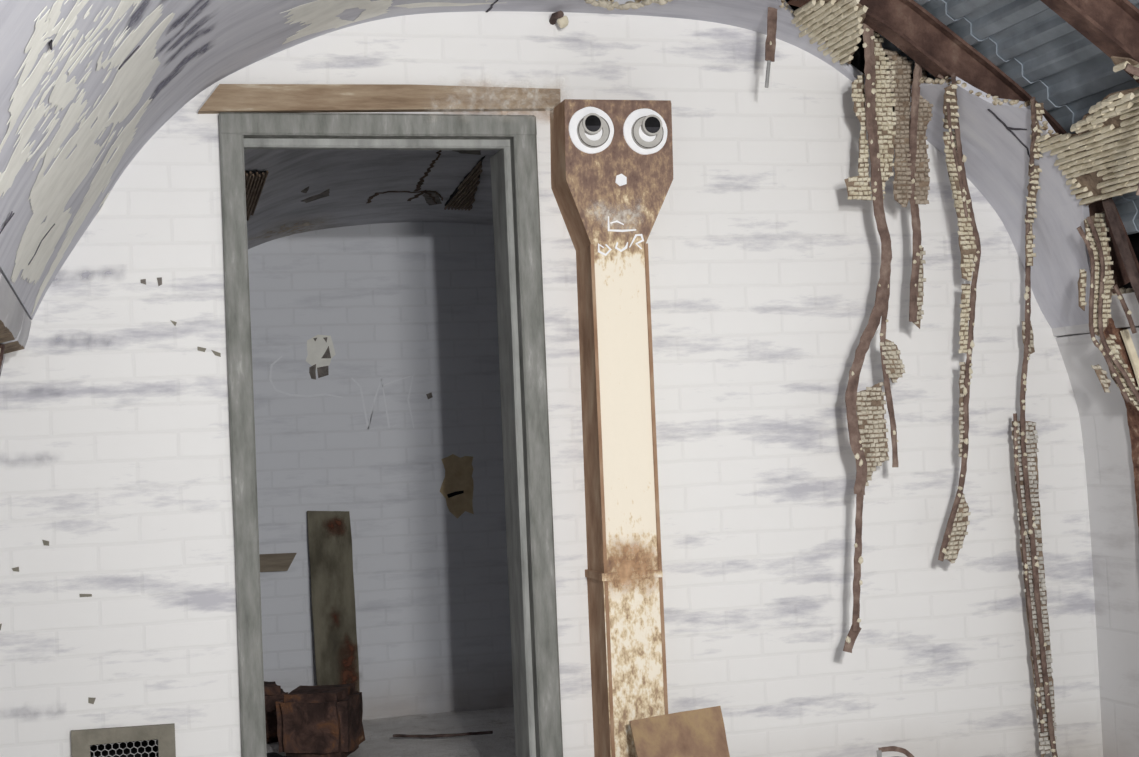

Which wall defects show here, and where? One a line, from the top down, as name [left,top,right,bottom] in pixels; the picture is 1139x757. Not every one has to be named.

spalling [585,0,673,11]
peeling [281,0,493,45]
spalling [909,76,1030,108]
peeling [0,0,175,315]
spalling [301,187,330,203]